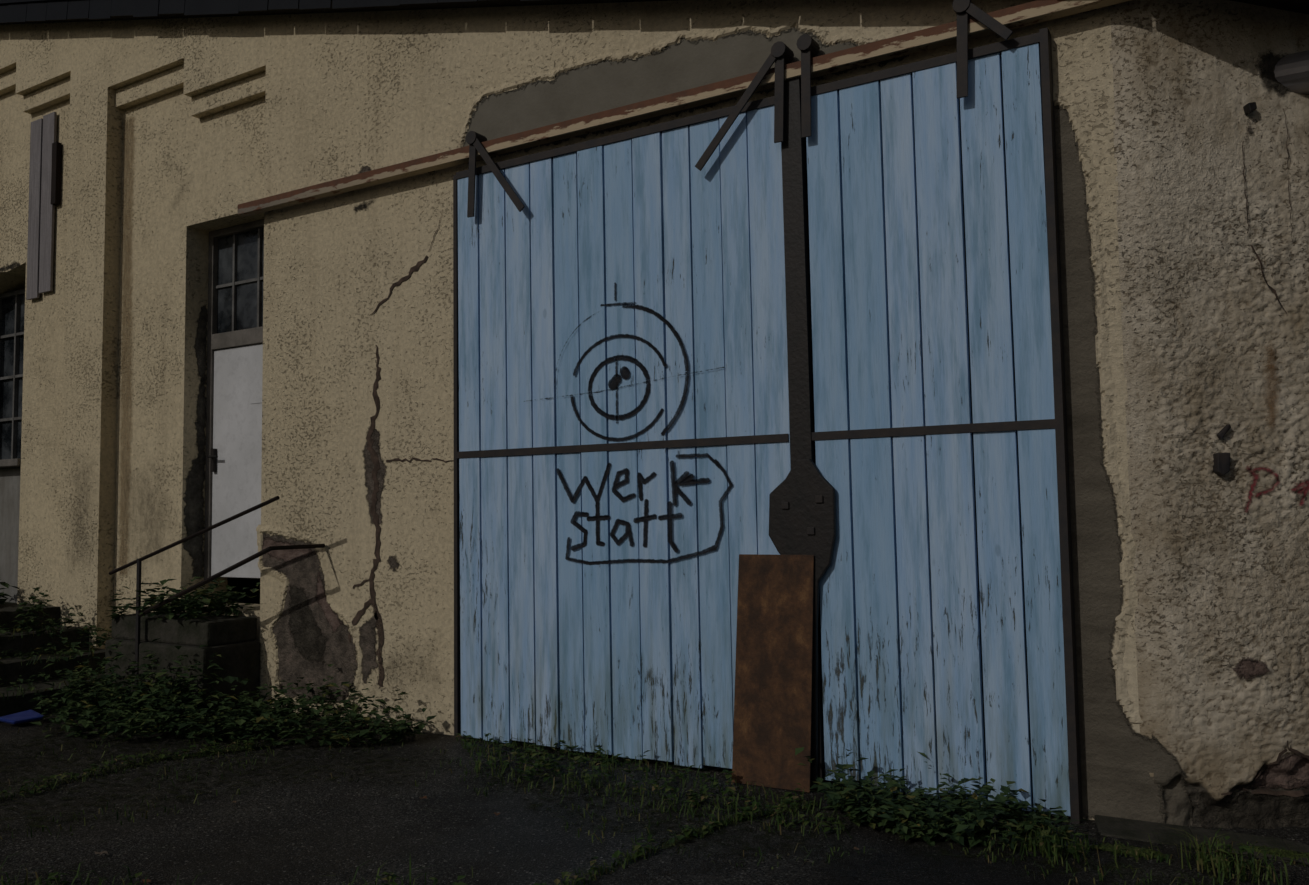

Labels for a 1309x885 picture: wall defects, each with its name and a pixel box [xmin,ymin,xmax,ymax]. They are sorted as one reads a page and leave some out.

flaking render [458,16,909,164]
crack [370,210,443,315]
spalling [183,305,208,577]
spalling [362,427,387,525]
crack [348,345,454,687]
flaking render [1053,87,1309,829]
spalling [256,525,378,713]